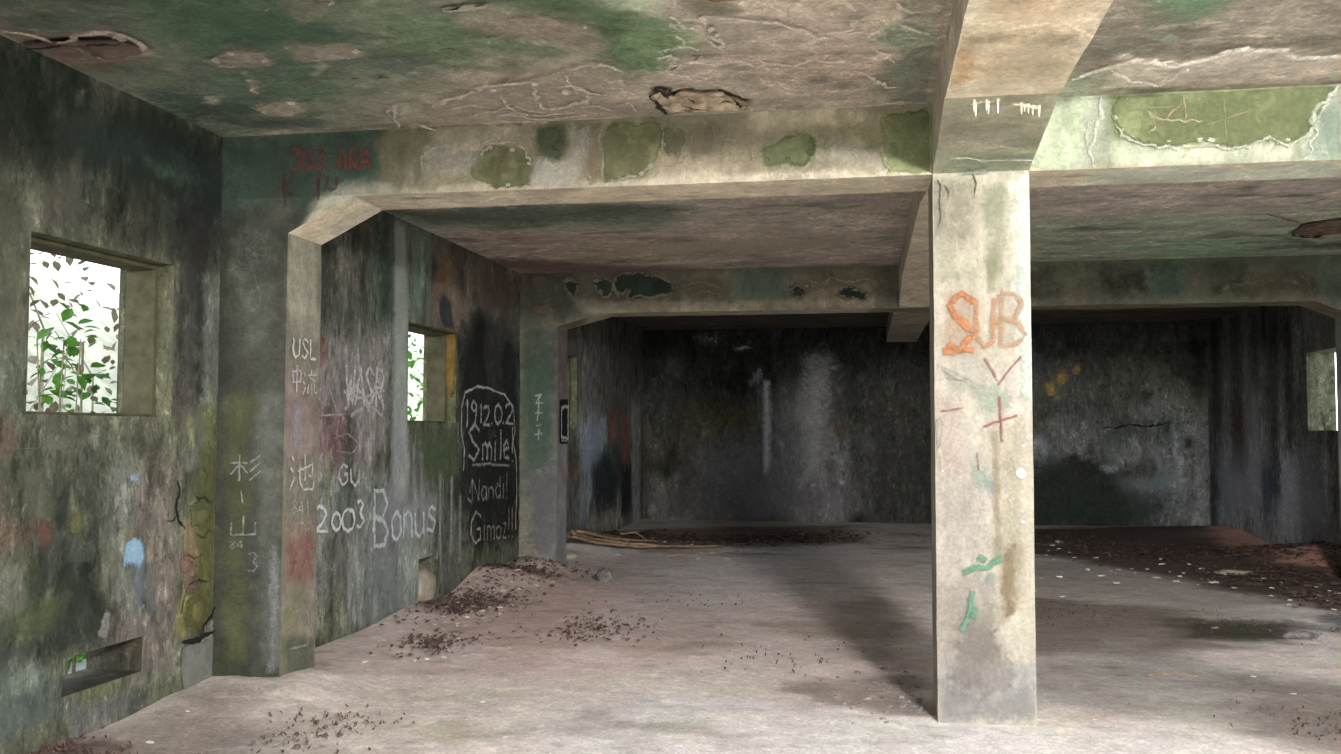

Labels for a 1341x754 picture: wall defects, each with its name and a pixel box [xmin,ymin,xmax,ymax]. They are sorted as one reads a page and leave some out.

spalling [442,4,490,13]
spalling [1,30,146,62]
peeling [656,0,725,71]
peeling [418,17,749,189]
peeling [1112,86,1337,151]
peeling [761,133,816,166]
spalling [1254,214,1341,248]
peeling [562,271,675,300]
water stain [753,369,771,474]
crack [1102,421,1170,430]